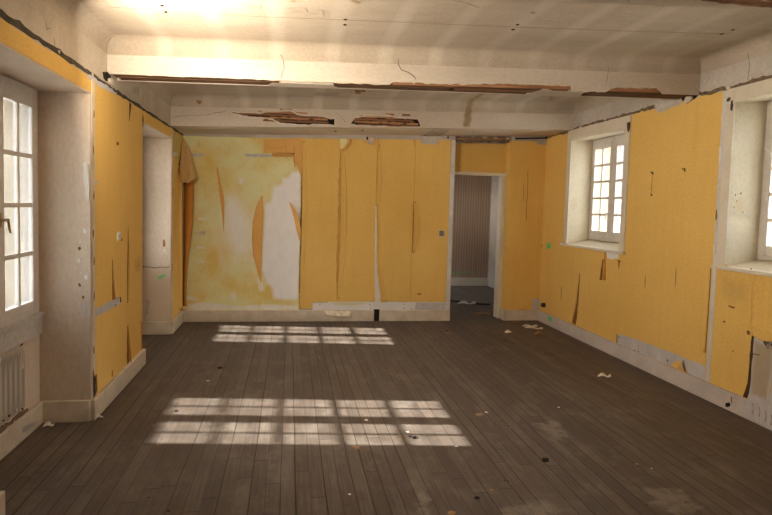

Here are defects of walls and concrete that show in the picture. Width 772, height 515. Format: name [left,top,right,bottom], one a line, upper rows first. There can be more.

spalling [698,0,772,9]
spalling [0,9,772,138]
flaking render [616,334,705,380]
flaking render [743,336,772,431]